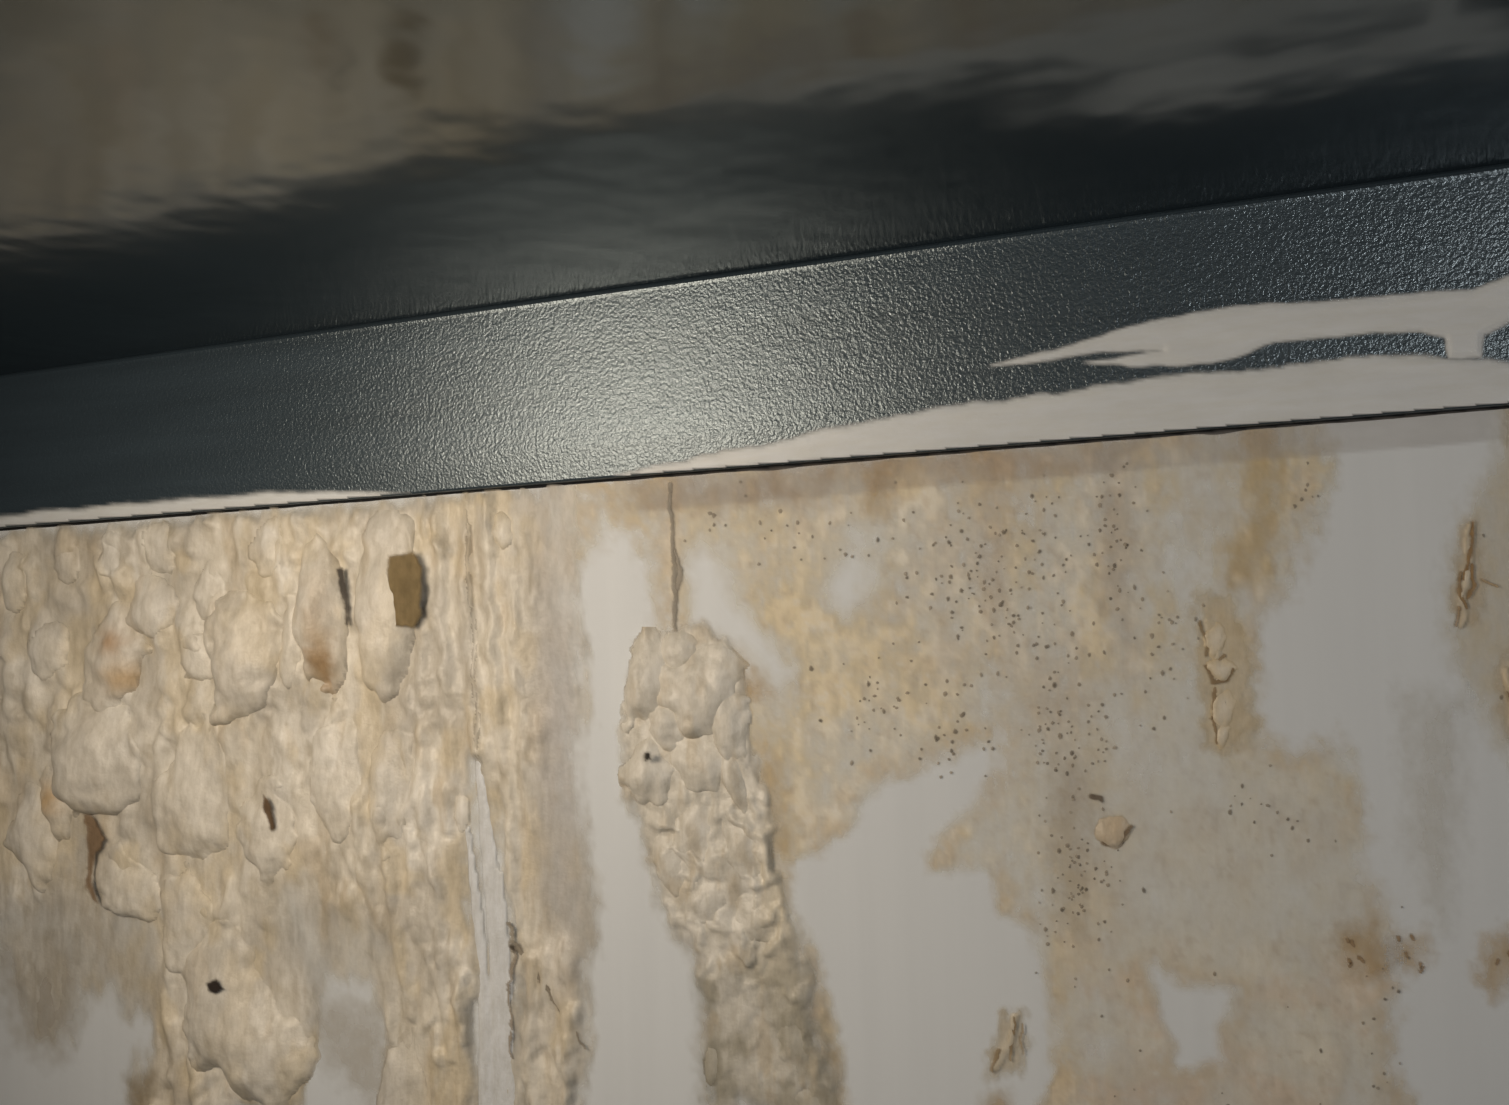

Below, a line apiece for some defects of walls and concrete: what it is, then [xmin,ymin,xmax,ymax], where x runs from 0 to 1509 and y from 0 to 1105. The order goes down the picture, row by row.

water stain [576,427,1414,1105]
peeling [1197,595,1256,755]
peeling [1452,522,1498,629]
water stain [1458,455,1509,728]